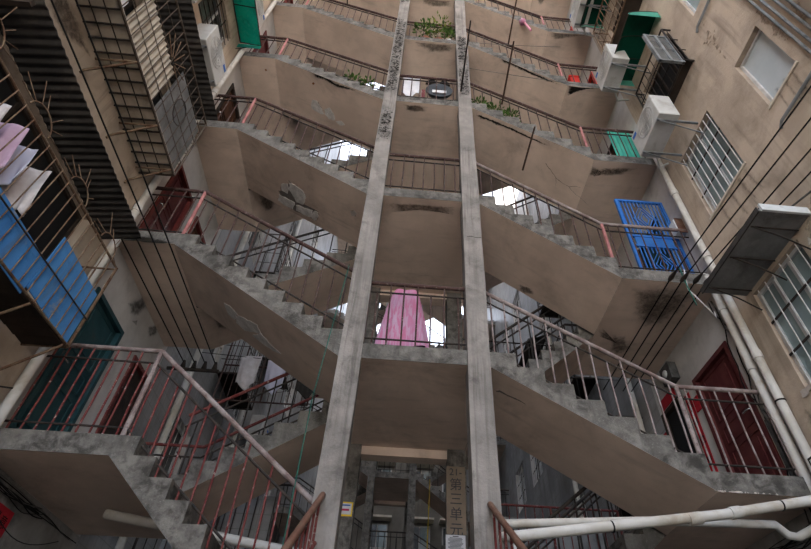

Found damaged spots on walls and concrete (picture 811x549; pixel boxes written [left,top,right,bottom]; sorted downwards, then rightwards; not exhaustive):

leakage [385,19,406,91]
flaking render [278,181,318,221]